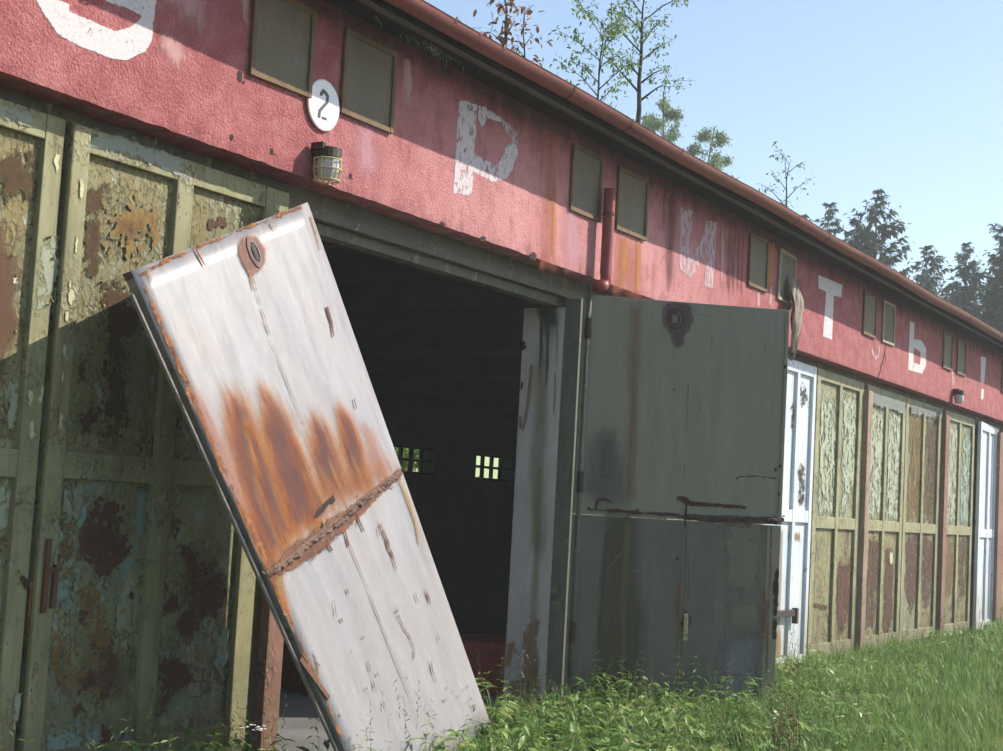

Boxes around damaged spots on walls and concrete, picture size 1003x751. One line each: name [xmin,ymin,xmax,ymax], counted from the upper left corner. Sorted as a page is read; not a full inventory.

peeling [33,233,75,321]
peeling [75,179,168,446]
peeling [90,127,192,183]
peeling [207,210,227,230]
rust [663,302,693,348]
peeling [42,480,150,751]
peeling [155,542,228,730]
rust [139,206,419,681]
rust [587,496,800,692]
peeling [790,382,857,517]
peeling [814,559,852,639]
peeling [865,391,971,633]